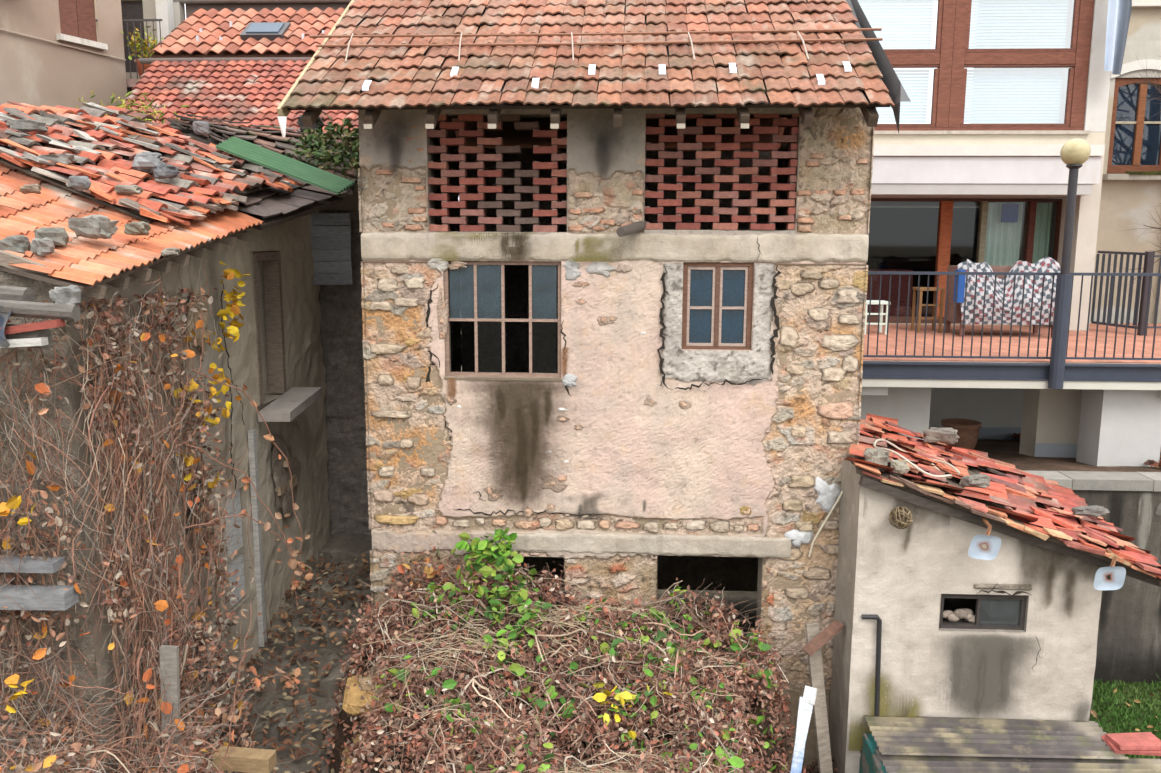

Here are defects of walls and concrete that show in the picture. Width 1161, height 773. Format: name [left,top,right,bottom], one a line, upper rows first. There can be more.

spalling [568,170,644,233]
spalling [796,107,874,234]
leakage [486,381,557,500]
spalling [361,261,868,690]
leakage [1109,494,1123,533]
leakage [1139,494,1151,549]
leakage [1094,660,1161,685]